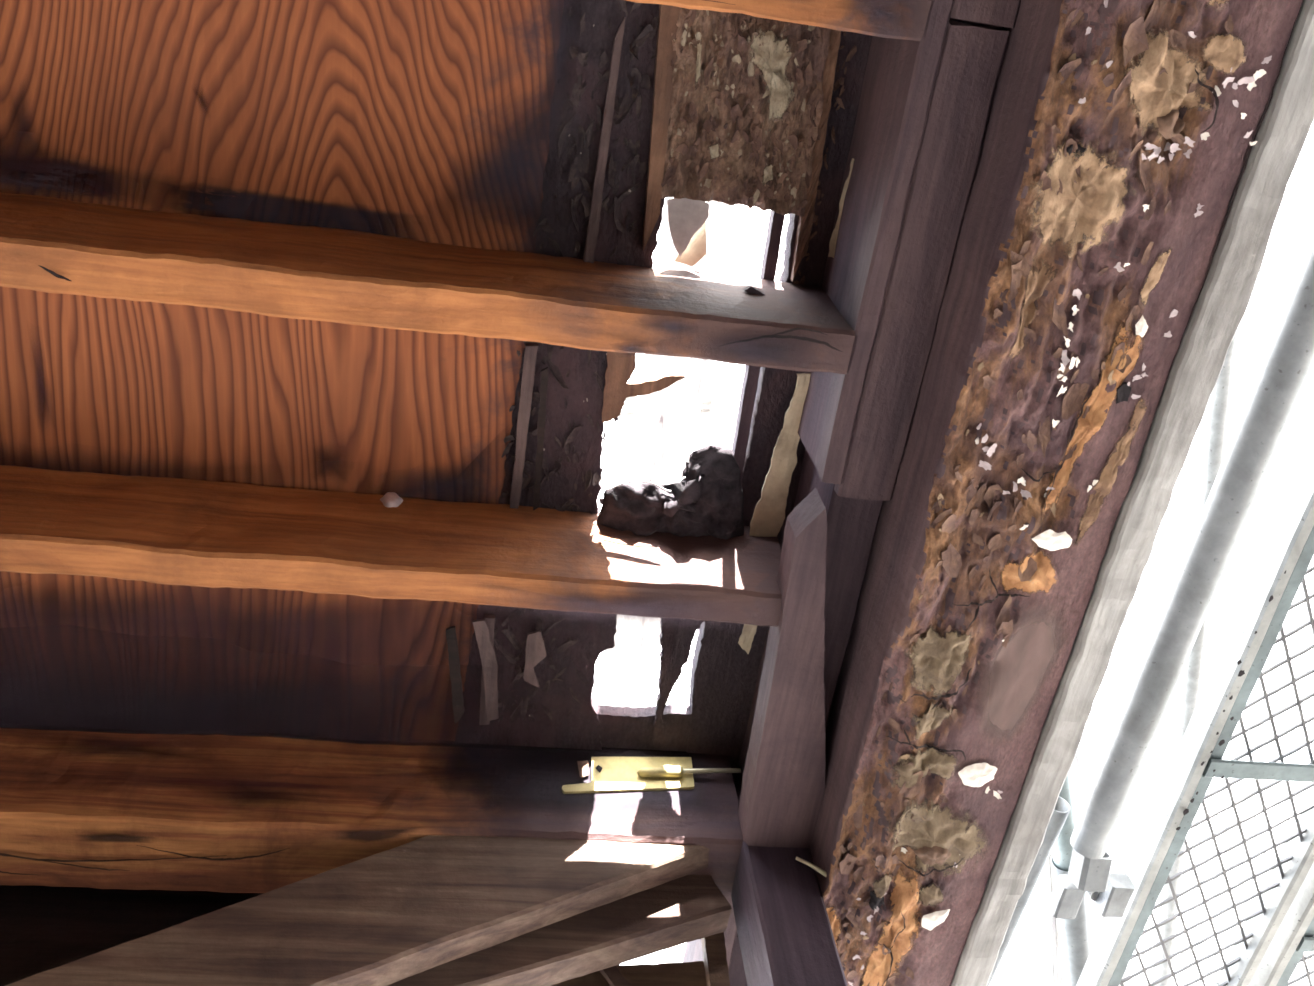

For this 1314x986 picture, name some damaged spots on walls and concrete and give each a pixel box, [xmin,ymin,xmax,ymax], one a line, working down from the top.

peeling [929,0,1272,648]
crack [0,845,289,875]
peeling [826,613,1003,986]